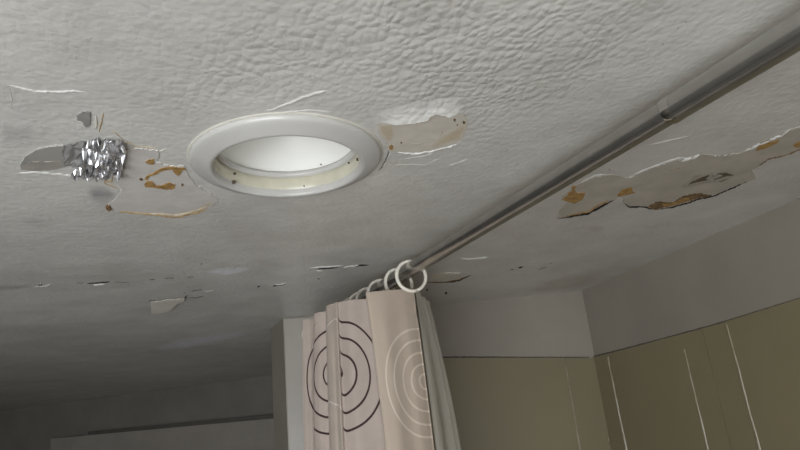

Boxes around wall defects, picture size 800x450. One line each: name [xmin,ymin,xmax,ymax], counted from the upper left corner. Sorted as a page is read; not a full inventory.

flaking render [77,110,91,127]
peeling [374,96,467,155]
peeling [106,130,218,218]
peeling [557,127,800,219]